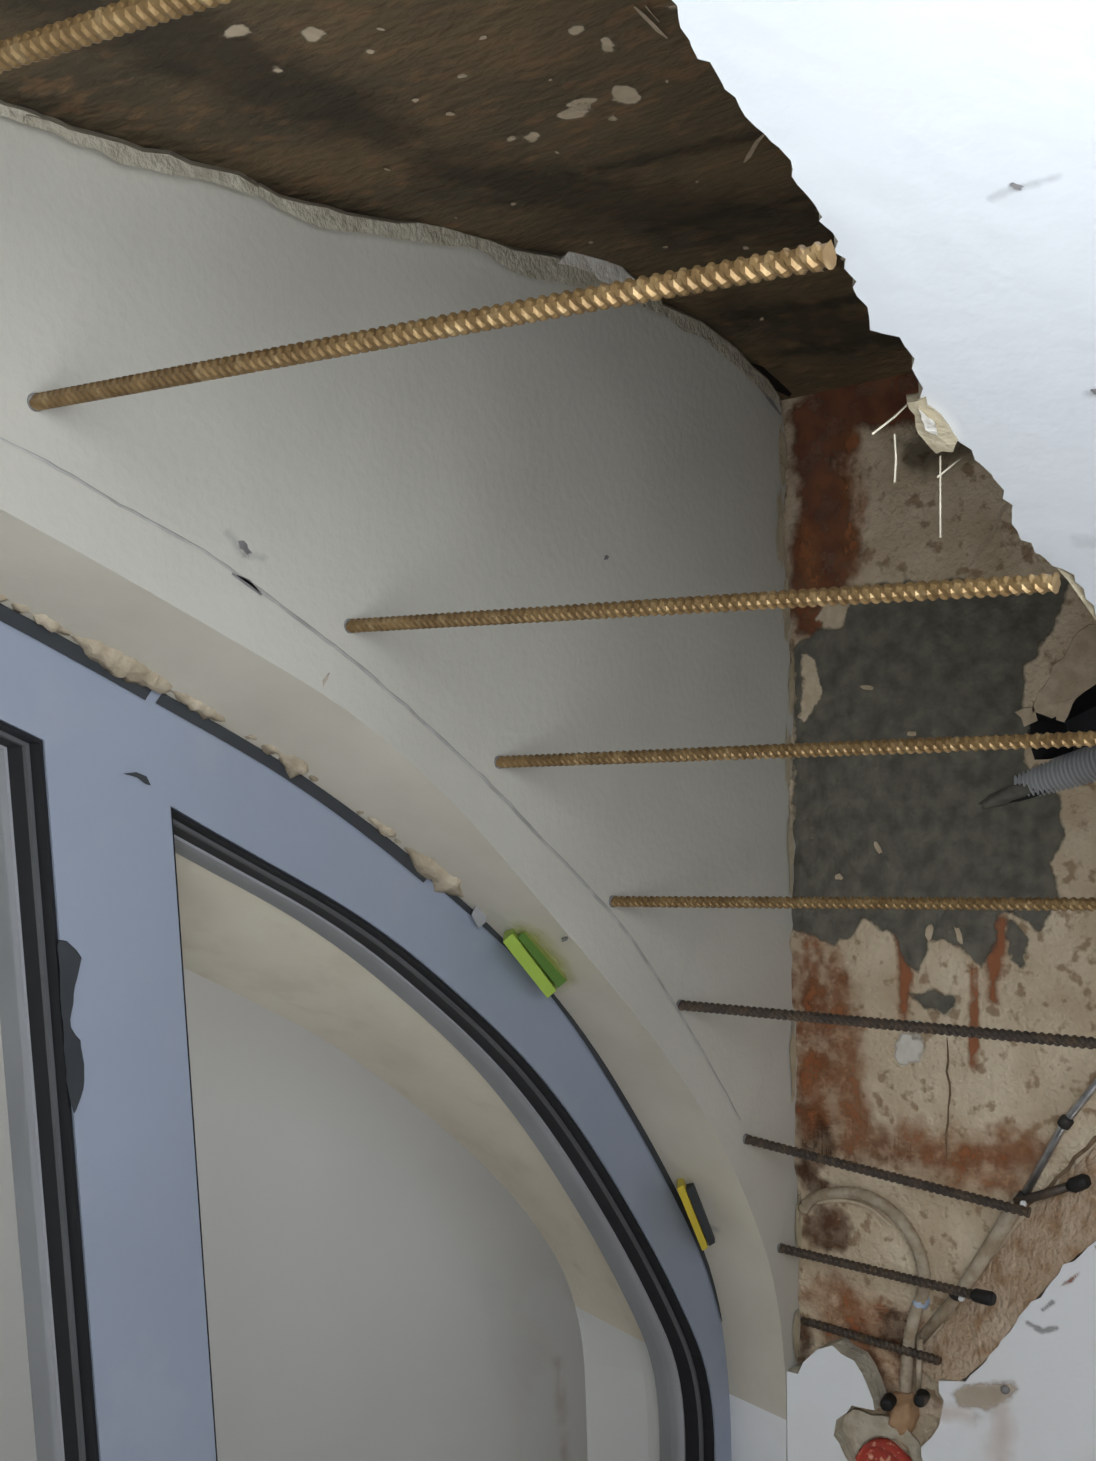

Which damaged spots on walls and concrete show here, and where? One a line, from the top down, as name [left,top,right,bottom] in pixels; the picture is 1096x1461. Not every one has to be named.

spalling [0,0,231,74]
peeling [224,24,251,38]
peeling [302,27,326,42]
peeling [557,85,641,121]
spalling [0,100,1096,791]
spalling [609,811,1096,944]
spalling [676,999,1096,1103]
corrosion [796,916,1046,1191]
spalling [743,1134,1031,1218]
spalling [777,1193,997,1306]
corrosion [800,1282,903,1393]
spalling [793,1309,942,1365]